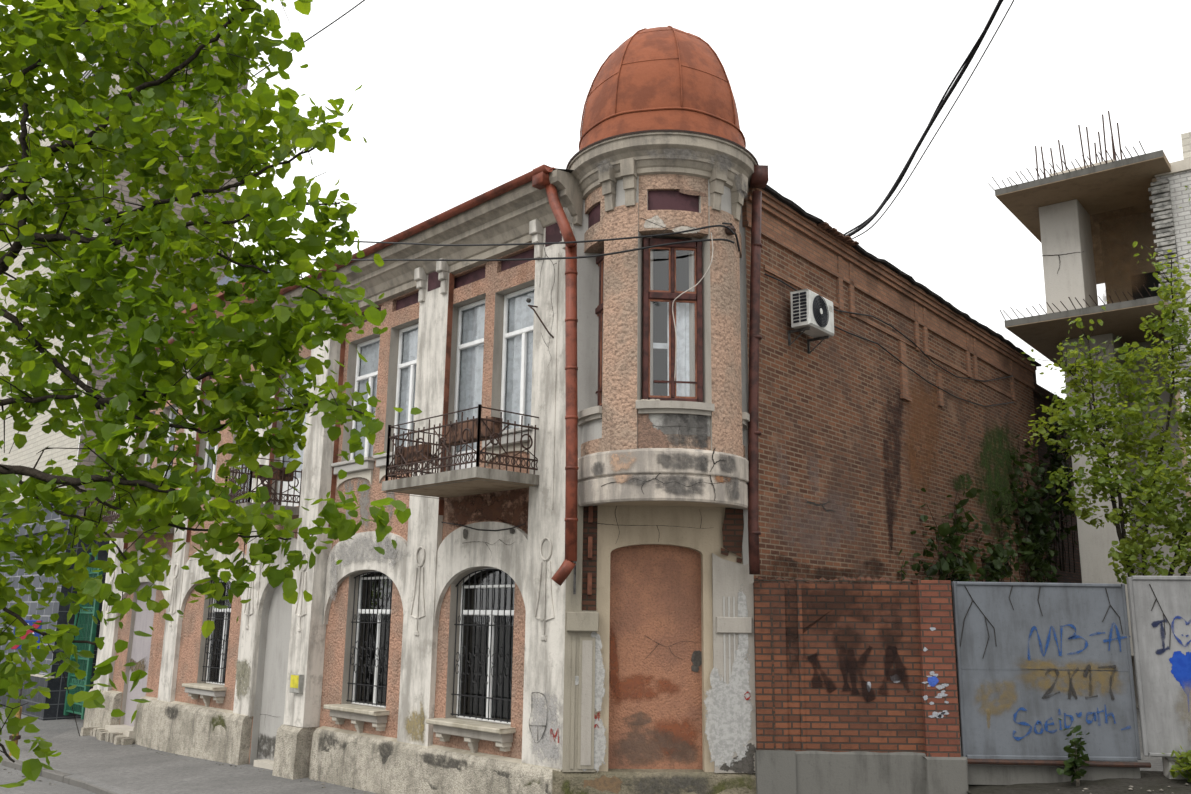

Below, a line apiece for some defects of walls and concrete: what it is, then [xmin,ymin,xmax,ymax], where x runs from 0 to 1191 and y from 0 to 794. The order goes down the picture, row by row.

leakage [593,462,603,475]
crack [597,448,726,541]
leakage [627,414,740,500]
leakage [884,396,902,548]
leakage [319,733,348,752]
leakage [379,742,392,764]
leakage [422,753,466,770]
flaking render [582,632,622,794]
leakage [630,776,711,794]
flaking render [691,633,756,775]